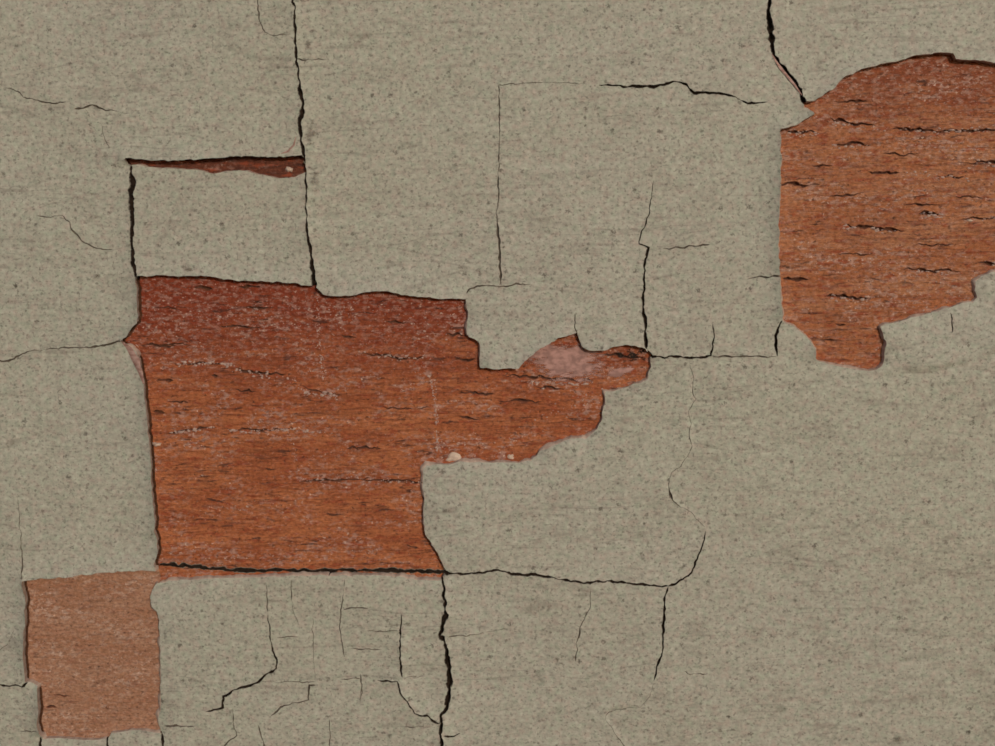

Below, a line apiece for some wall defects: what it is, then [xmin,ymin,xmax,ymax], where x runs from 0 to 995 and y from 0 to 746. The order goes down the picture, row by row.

crack [766,0,806,103]
crack [466,81,766,293]
peeling [772,52,995,371]
crack [16,497,24,580]
crack [0,340,120,362]
peeling [22,137,651,740]
crack [160,181,782,746]
crack [0,681,28,689]